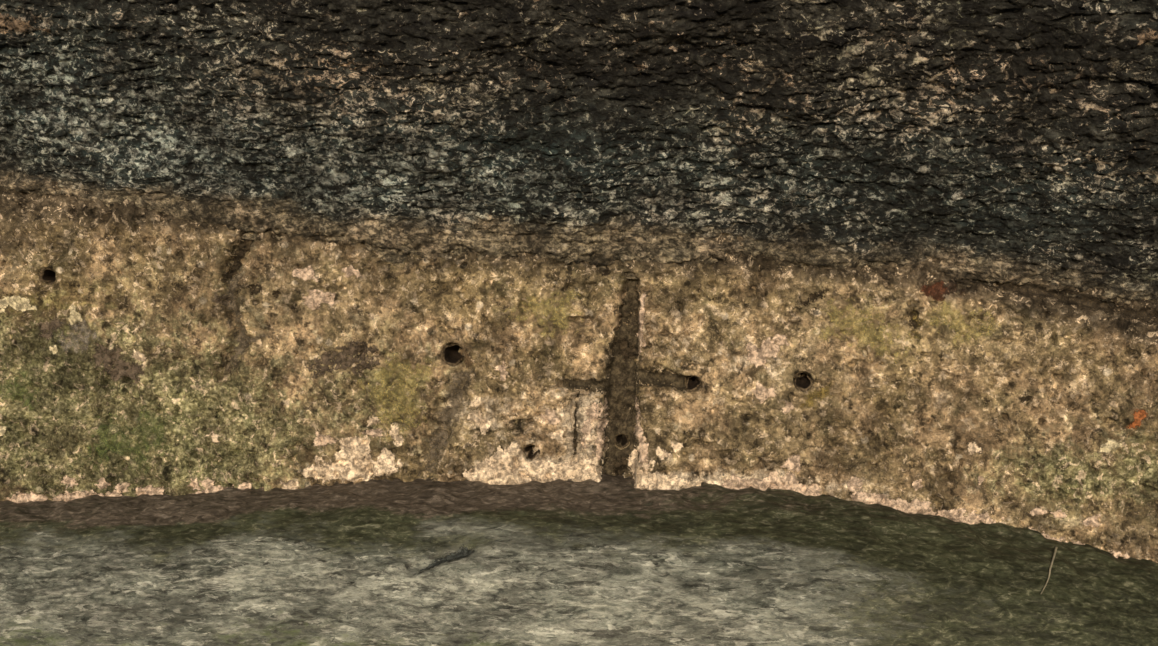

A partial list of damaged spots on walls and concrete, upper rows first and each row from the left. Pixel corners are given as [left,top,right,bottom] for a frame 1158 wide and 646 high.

corrosion [1126,409,1147,429]